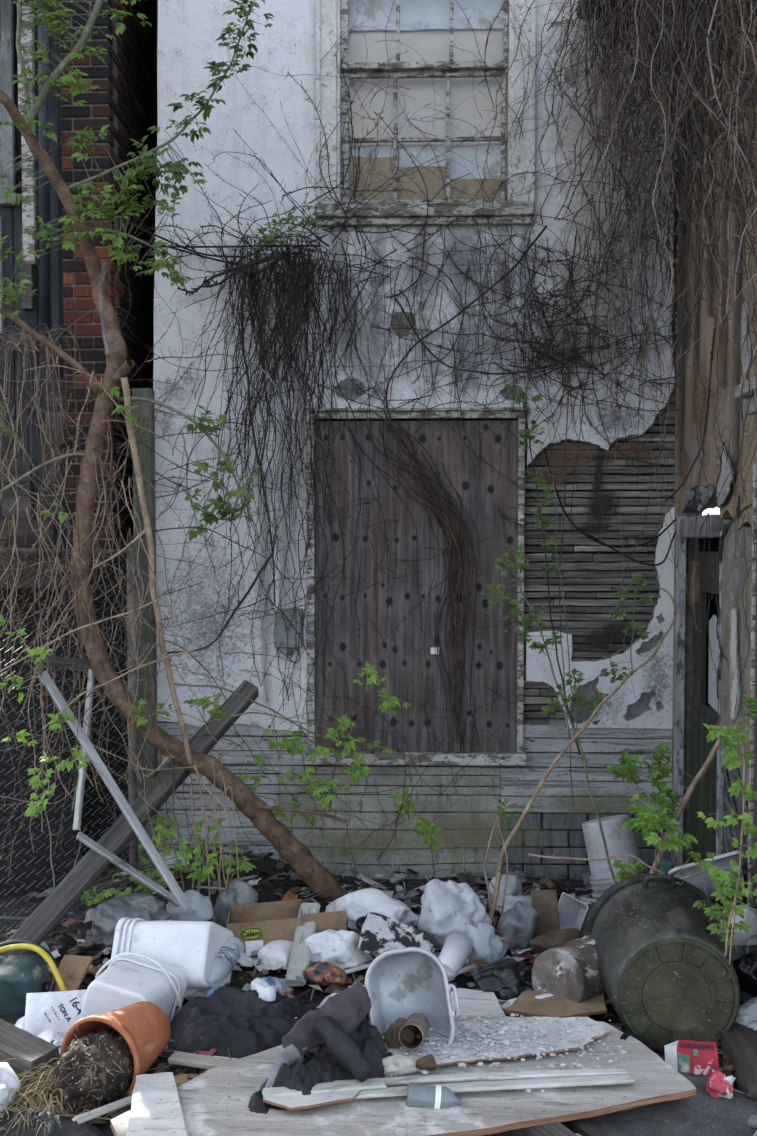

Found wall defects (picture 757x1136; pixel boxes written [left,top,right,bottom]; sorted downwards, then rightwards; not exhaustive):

spalling [390,310,417,339]
spalling [332,378,367,403]
spalling [524,384,735,728]